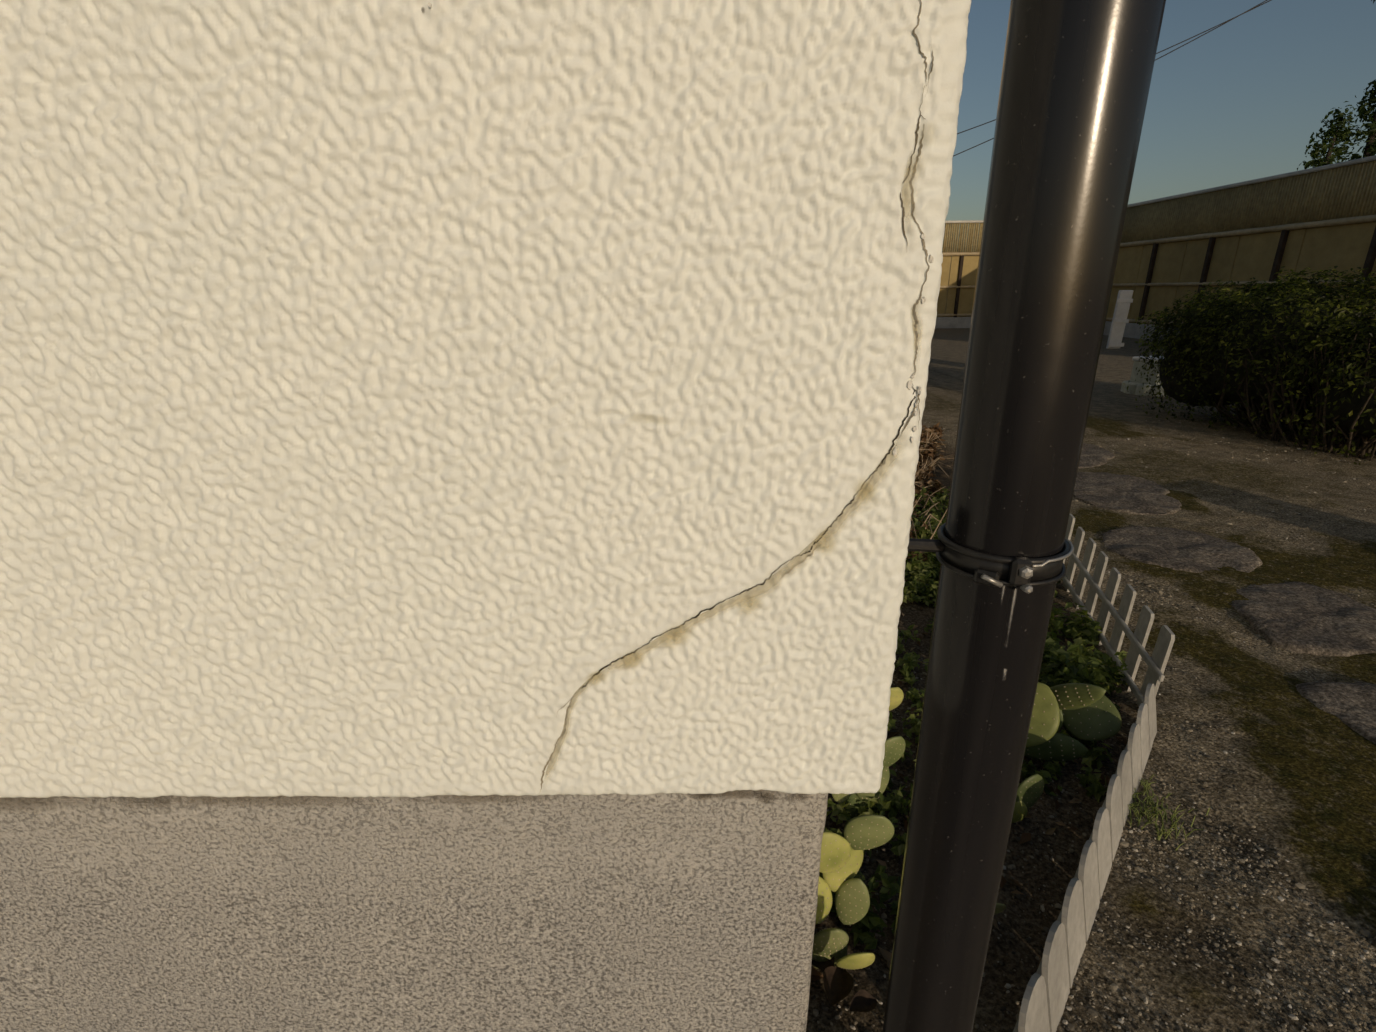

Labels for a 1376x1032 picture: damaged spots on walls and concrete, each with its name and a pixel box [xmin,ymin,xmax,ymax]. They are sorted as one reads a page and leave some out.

crack [541,0,934,789]